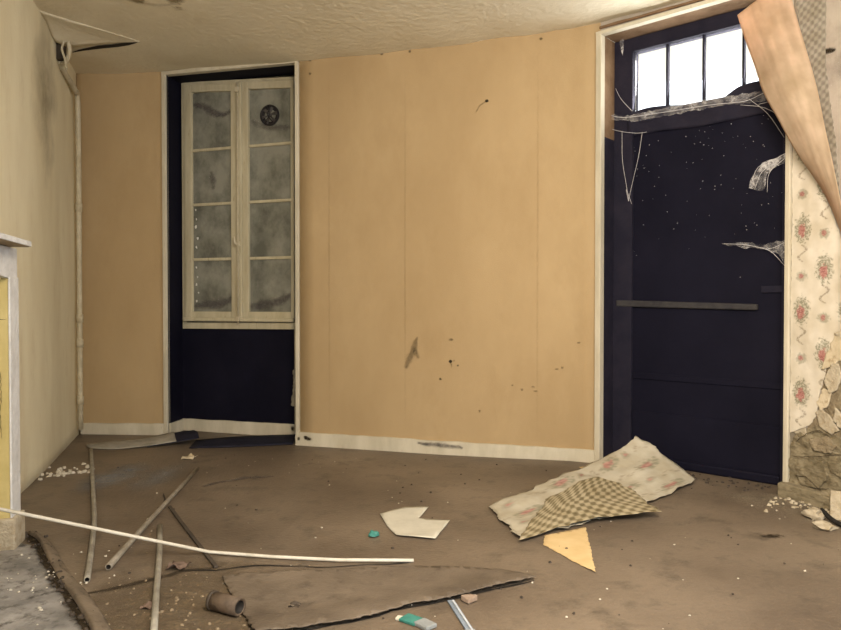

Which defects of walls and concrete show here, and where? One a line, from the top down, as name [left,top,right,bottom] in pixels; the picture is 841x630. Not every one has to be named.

flaking render [788,331,841,495]